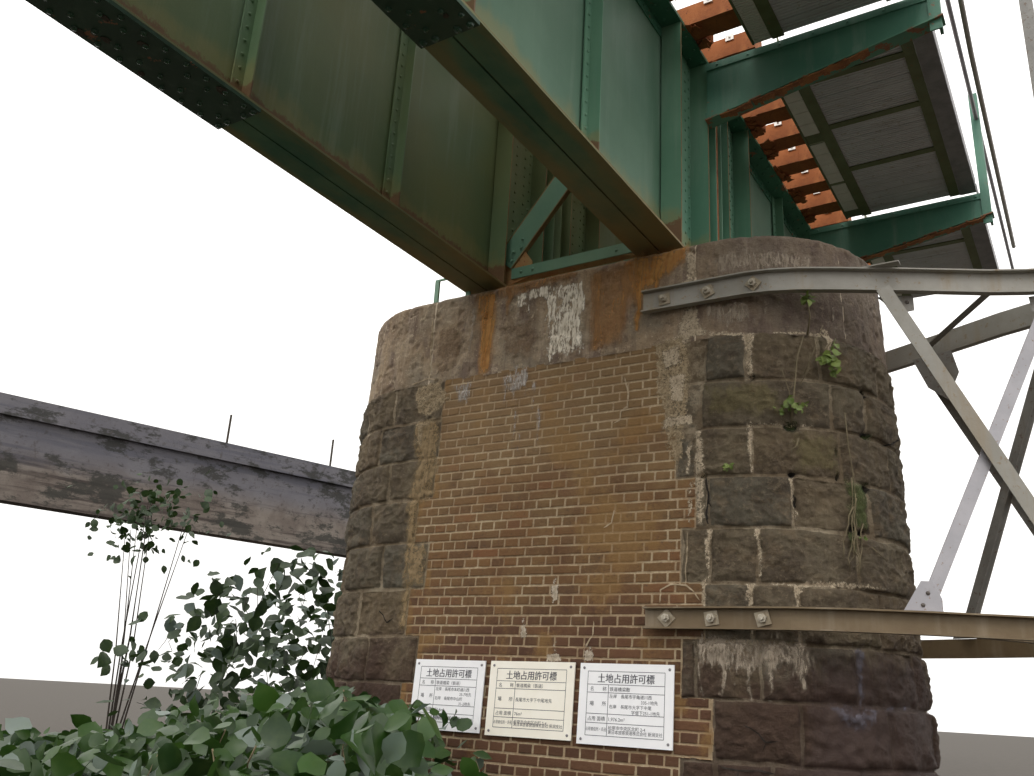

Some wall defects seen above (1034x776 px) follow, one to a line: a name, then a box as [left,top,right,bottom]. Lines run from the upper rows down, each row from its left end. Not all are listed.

rust [719,48,870,118]
rust [478,272,575,373]
efflorescence [518,281,585,362]
rust [624,245,688,331]
damp [696,634,810,699]
damp [787,650,938,776]